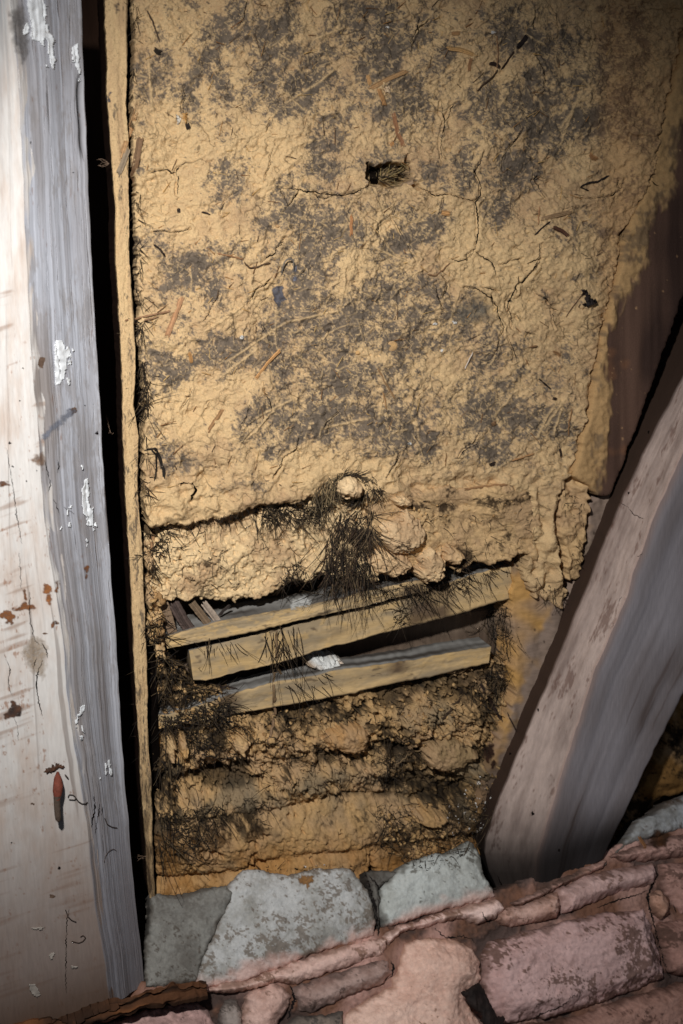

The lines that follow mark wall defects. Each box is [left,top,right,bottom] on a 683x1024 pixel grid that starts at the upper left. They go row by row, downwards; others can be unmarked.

peeling [23,0,56,69]
crack [265,120,369,205]
crack [414,131,558,361]
peeling [54,340,75,385]
peeling [60,465,98,547]
corrosion [0,582,58,625]
spalling [142,482,542,709]
spalling [150,652,508,895]